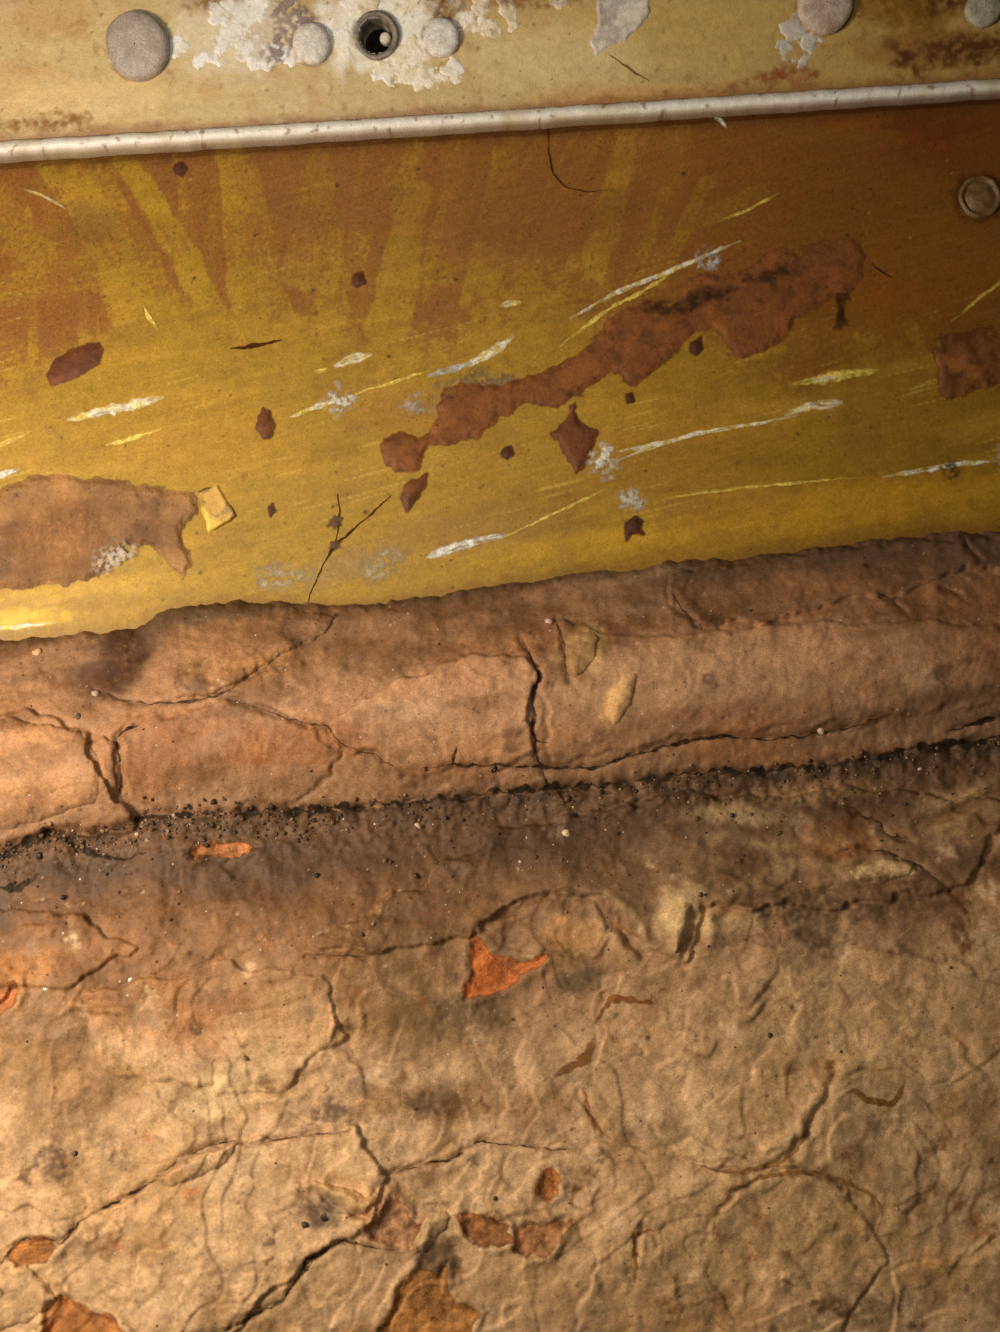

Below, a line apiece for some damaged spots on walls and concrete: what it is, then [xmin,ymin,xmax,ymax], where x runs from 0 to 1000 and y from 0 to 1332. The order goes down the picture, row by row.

rust [891,34,1000,75]
peeling [0,474,237,590]
crack [307,494,391,603]
crack [0,624,1000,896]
damp [758,882,971,959]
crack [0,1140,237,1265]
crack [270,1132,341,1141]
crack [397,1140,565,1172]
crack [223,1239,395,1332]